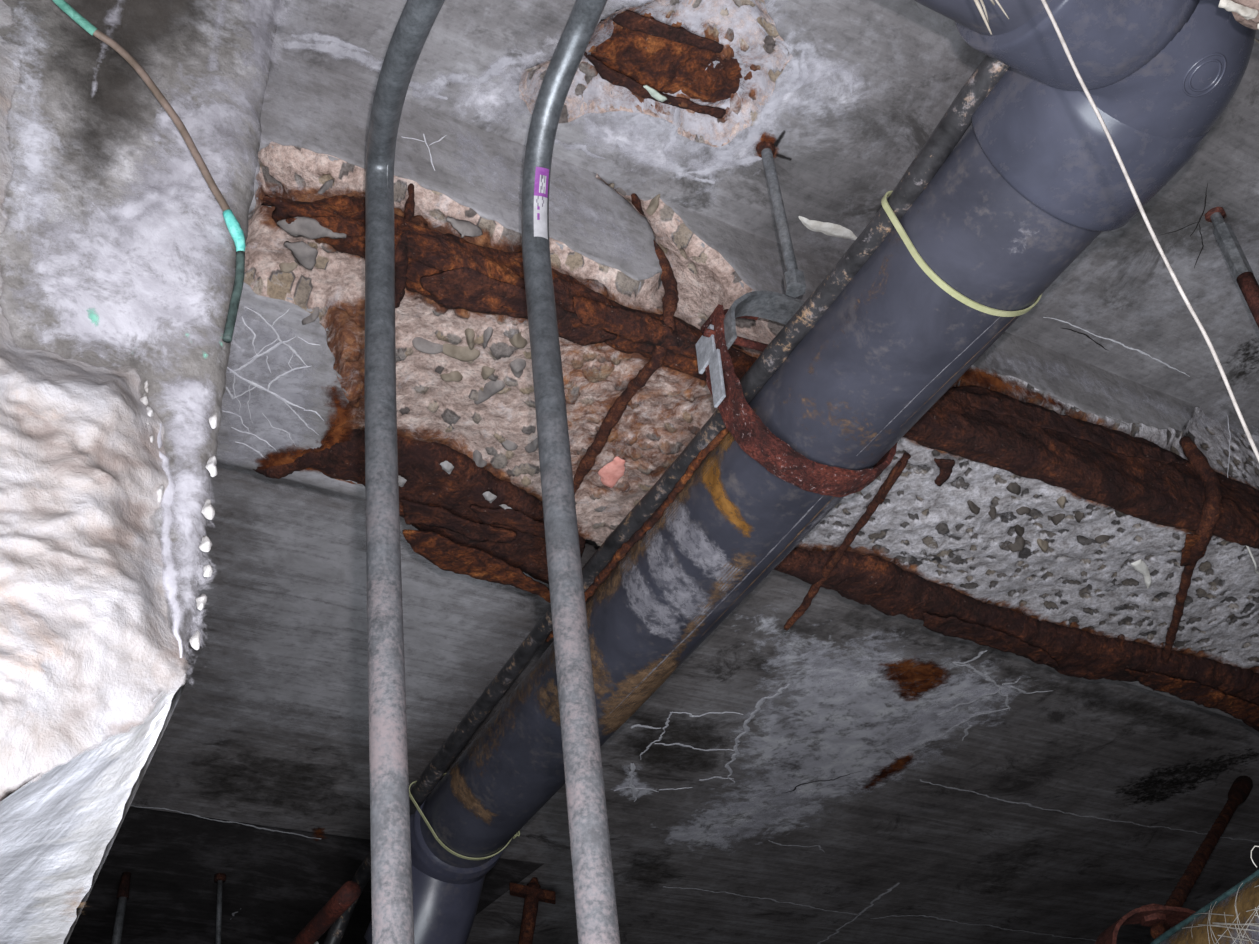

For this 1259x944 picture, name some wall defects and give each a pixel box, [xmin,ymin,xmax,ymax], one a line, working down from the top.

corrosion [584,9,746,119]
damp [0,0,382,801]
crack [223,306,324,458]
spalling [244,142,366,446]
spalling [395,287,542,501]
corrosion [397,435,551,603]
spalling [559,337,718,546]
corrosion [774,368,1259,732]
spalling [794,437,1259,673]
damp [614,713,713,802]
crack [630,684,790,790]
damp [663,618,1022,851]